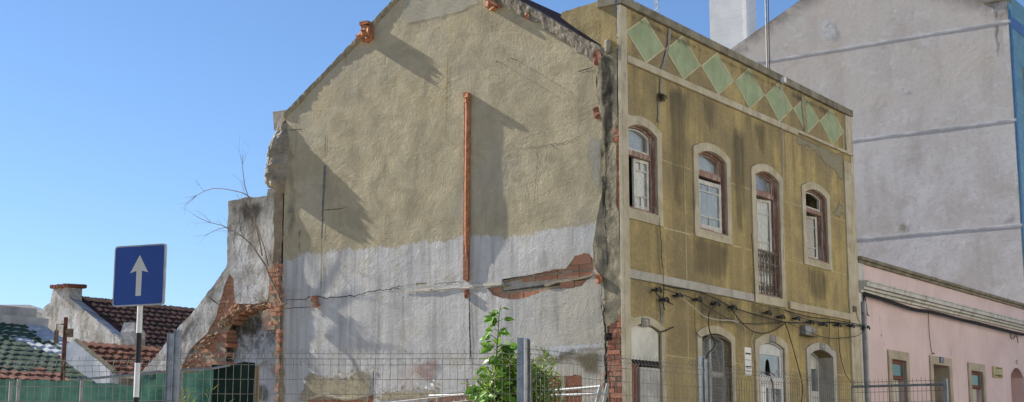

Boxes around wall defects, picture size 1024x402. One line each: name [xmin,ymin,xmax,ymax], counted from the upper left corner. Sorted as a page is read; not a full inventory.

spalling [398,253,594,299]